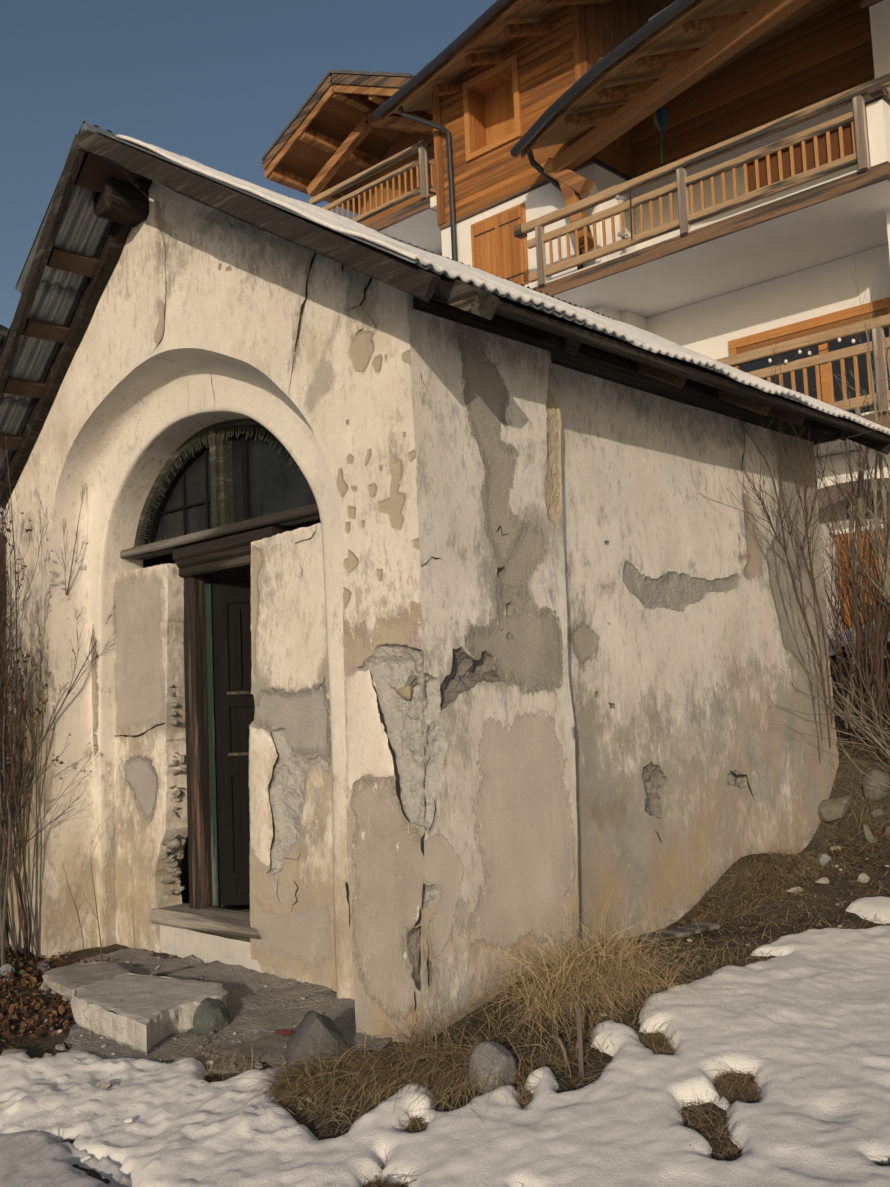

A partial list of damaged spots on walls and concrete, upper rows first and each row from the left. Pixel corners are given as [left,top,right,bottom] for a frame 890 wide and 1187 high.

crack [288,252,376,393]
peeling [250,545,263,674]
peeling [336,327,600,1021]
peeling [623,433,829,664]
peeling [124,755,159,822]
peeling [254,683,331,875]
crack [370,671,436,855]
spalling [641,761,667,818]
spalling [726,770,748,788]